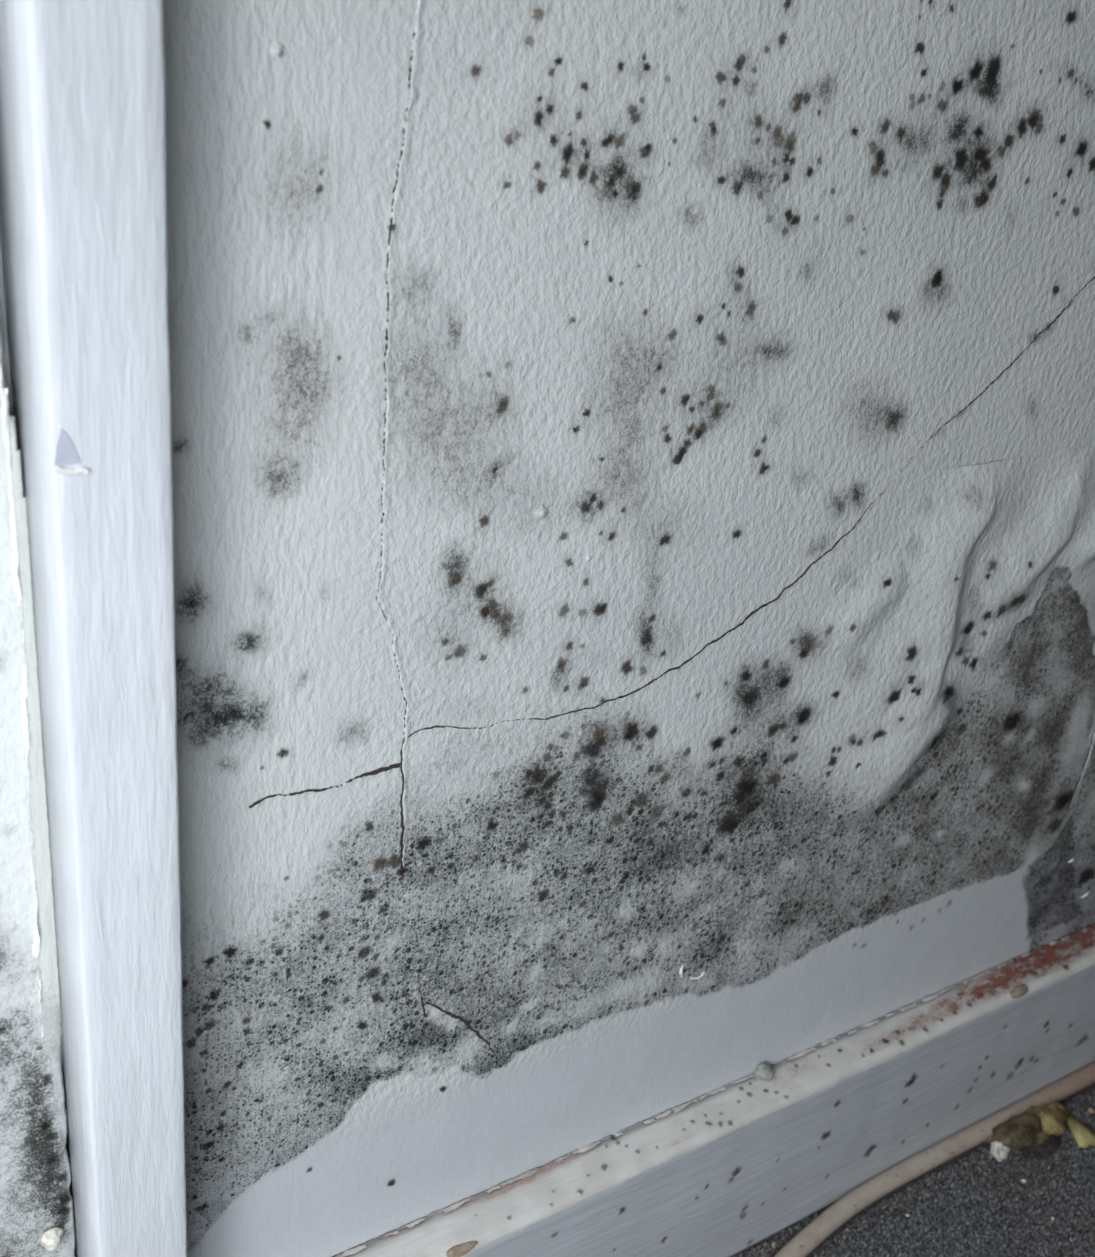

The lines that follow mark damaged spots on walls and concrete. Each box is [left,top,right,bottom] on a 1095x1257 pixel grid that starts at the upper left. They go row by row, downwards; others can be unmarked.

water stain [550,112,641,207]
water stain [718,116,821,198]
water stain [869,120,927,176]
water stain [910,57,1042,209]
water stain [665,387,729,464]
crack [249,0,1095,1059]
water stain [476,580,517,637]
water stain [956,595,1027,669]
water stain [175,641,1095,1246]
corrosion [882,924,1095,1040]
water stain [0,1018,71,1257]
peeling [446,1241,478,1257]